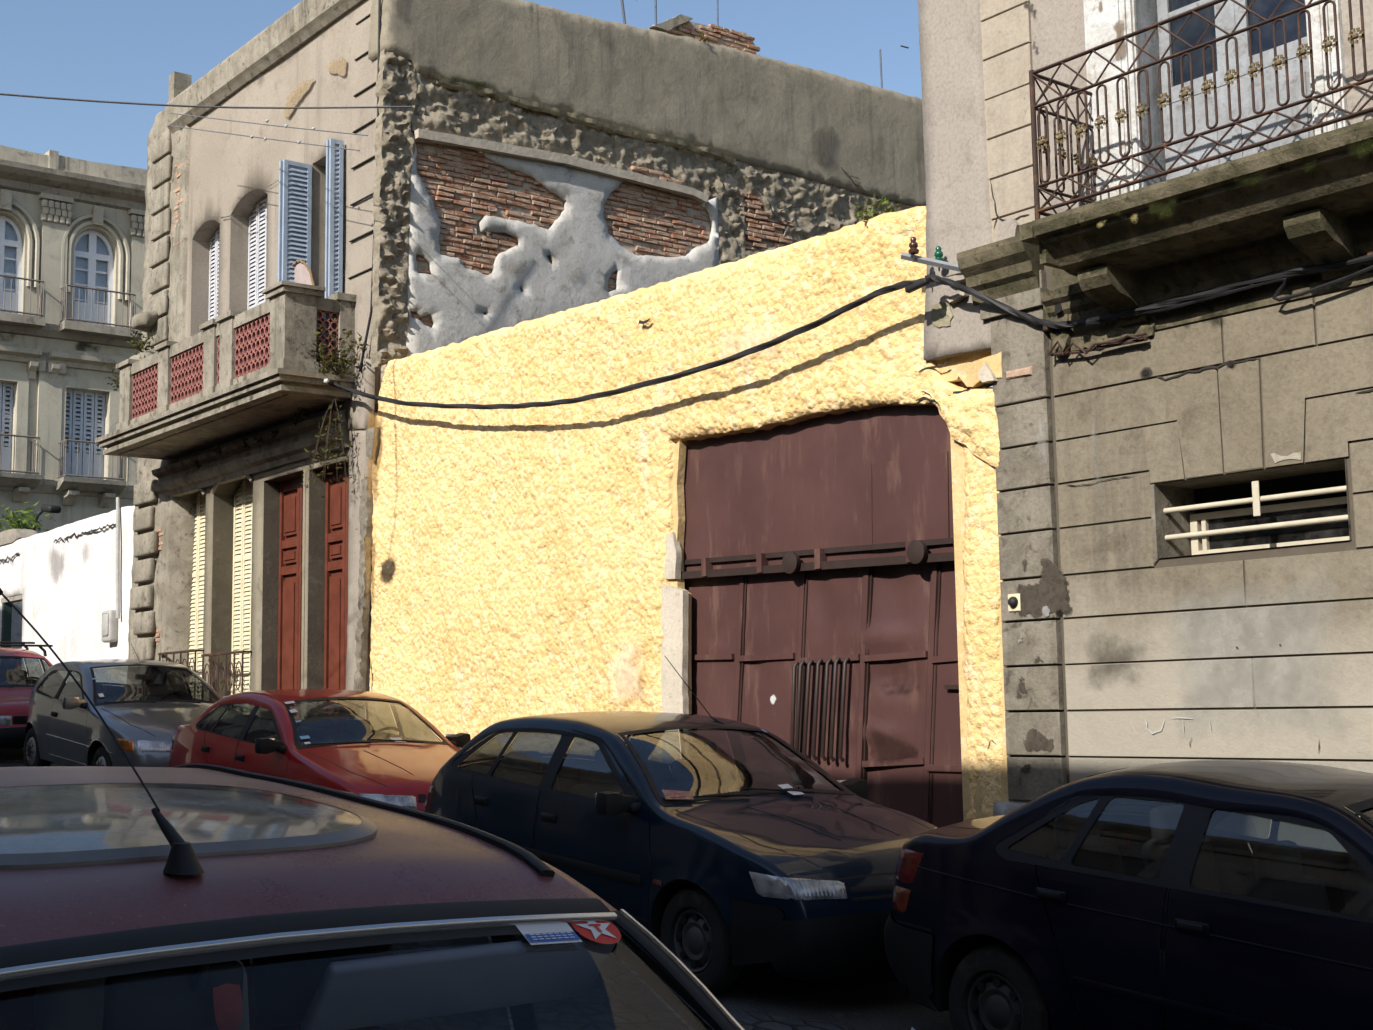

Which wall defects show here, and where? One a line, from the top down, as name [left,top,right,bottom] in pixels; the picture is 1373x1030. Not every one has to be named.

peeling [1114,21,1125,60]
water stain [814,127,835,164]
flaking render [370,49,914,368]
flaking render [950,351,1033,388]